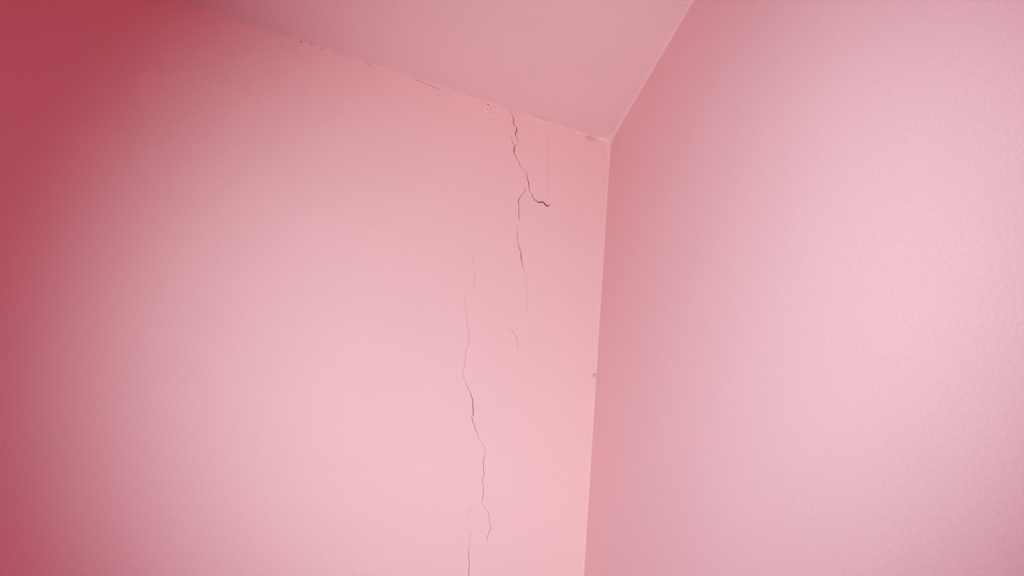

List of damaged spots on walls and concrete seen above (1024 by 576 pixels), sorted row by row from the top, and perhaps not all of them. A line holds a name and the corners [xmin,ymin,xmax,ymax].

crack [508,108,551,352]
crack [462,251,491,576]